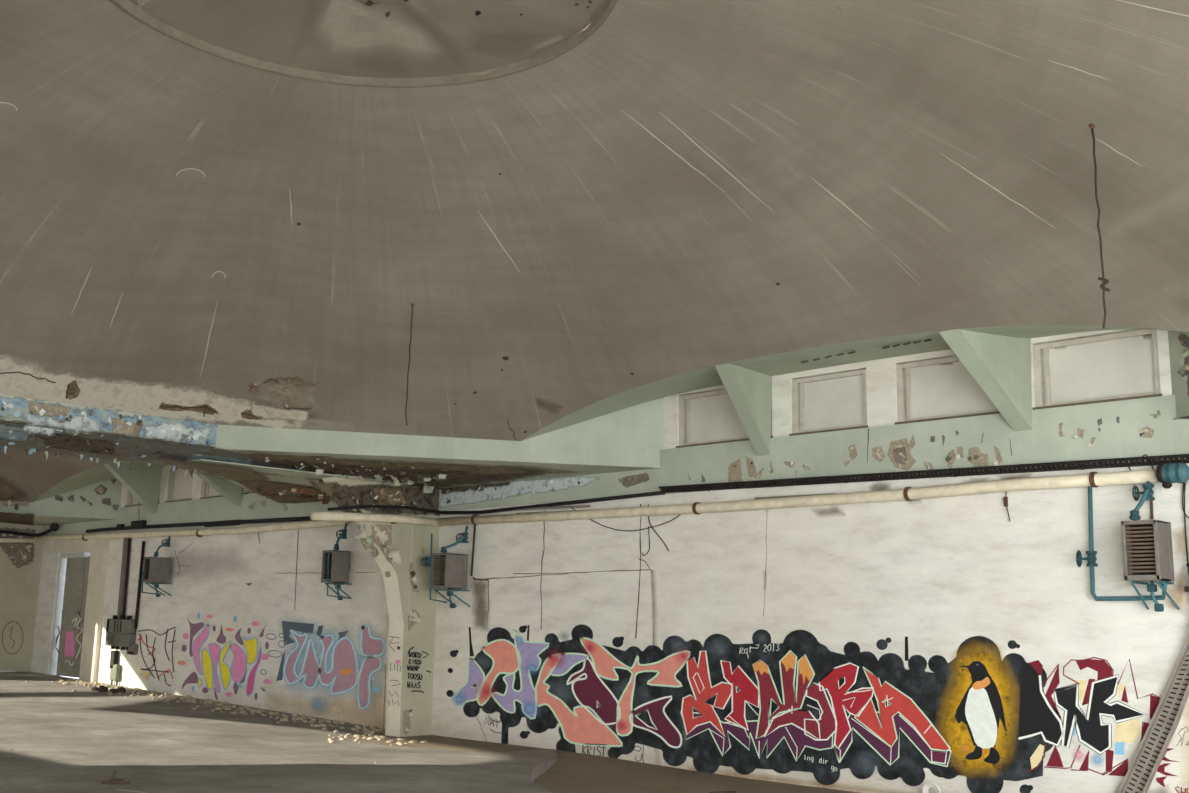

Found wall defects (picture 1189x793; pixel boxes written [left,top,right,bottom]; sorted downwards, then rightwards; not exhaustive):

peeling [1177,333,1189,396]
peeling [872,436,933,471]
peeling [930,431,1003,469]
peeling [1059,419,1102,447]
peeling [1139,410,1160,438]
peeling [0,356,599,592]
peeling [618,473,649,487]